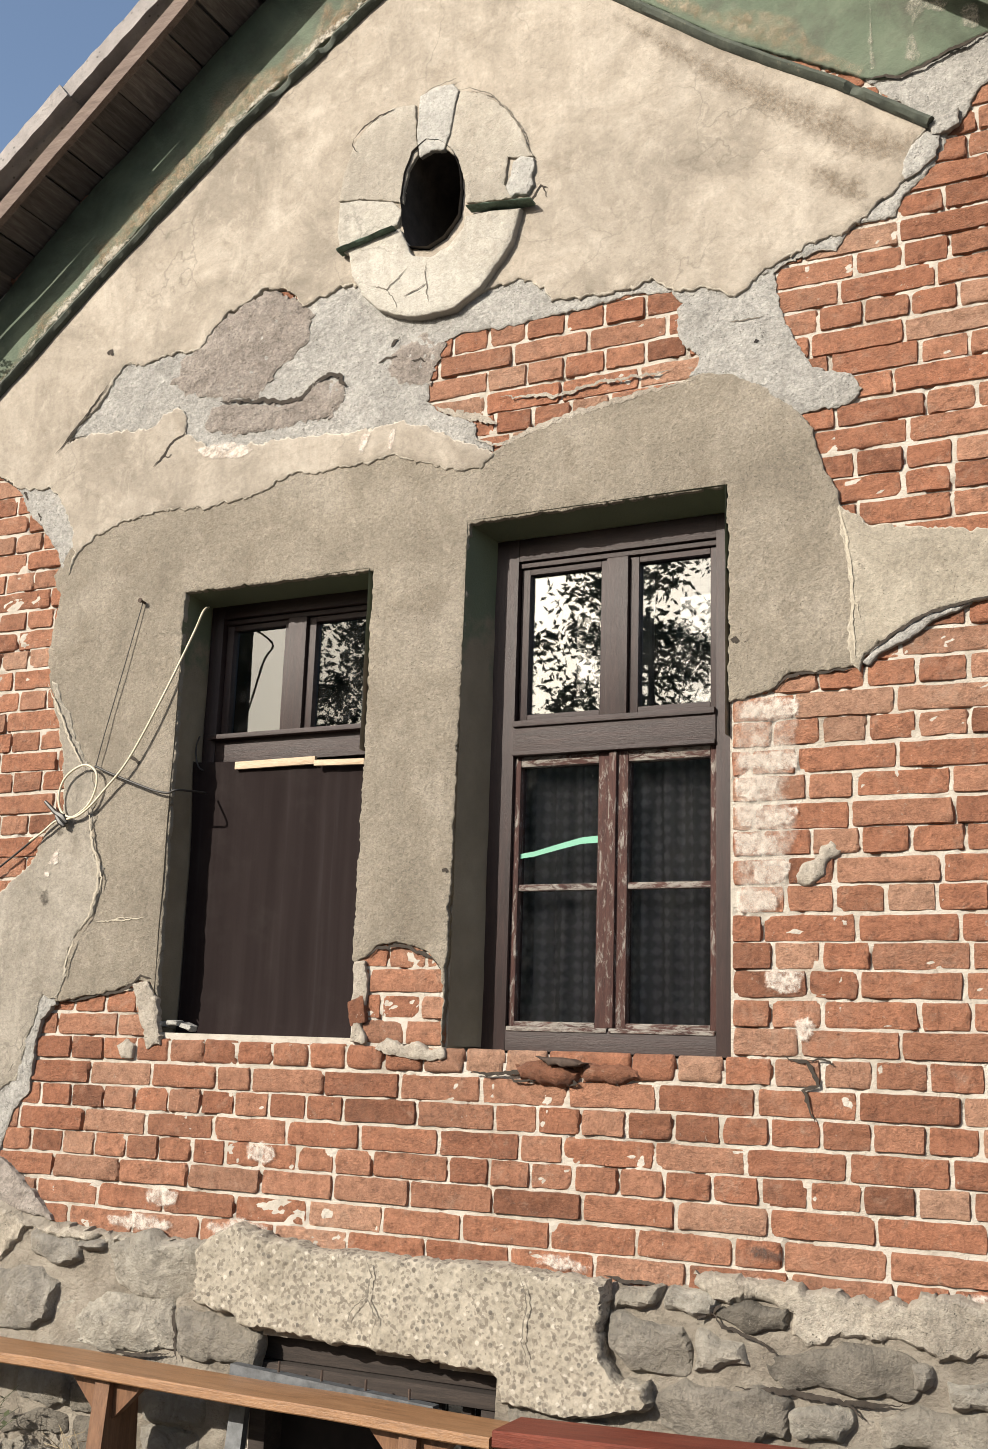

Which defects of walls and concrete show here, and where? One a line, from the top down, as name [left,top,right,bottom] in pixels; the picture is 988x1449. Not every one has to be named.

peeling [22,240,129,358]
flaking render [71,1,988,452]